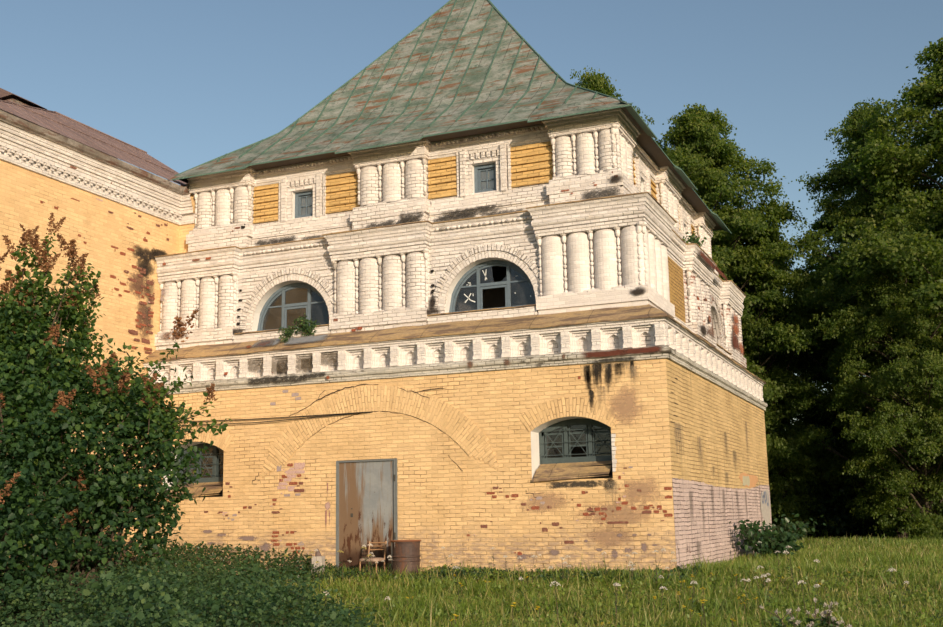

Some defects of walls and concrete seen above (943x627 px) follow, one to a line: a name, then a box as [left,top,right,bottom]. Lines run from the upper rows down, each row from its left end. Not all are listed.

leakage [584,361,634,407]
crack [290,384,466,470]
peeling [270,462,308,514]
peeling [486,487,556,511]
peeling [550,466,673,558]